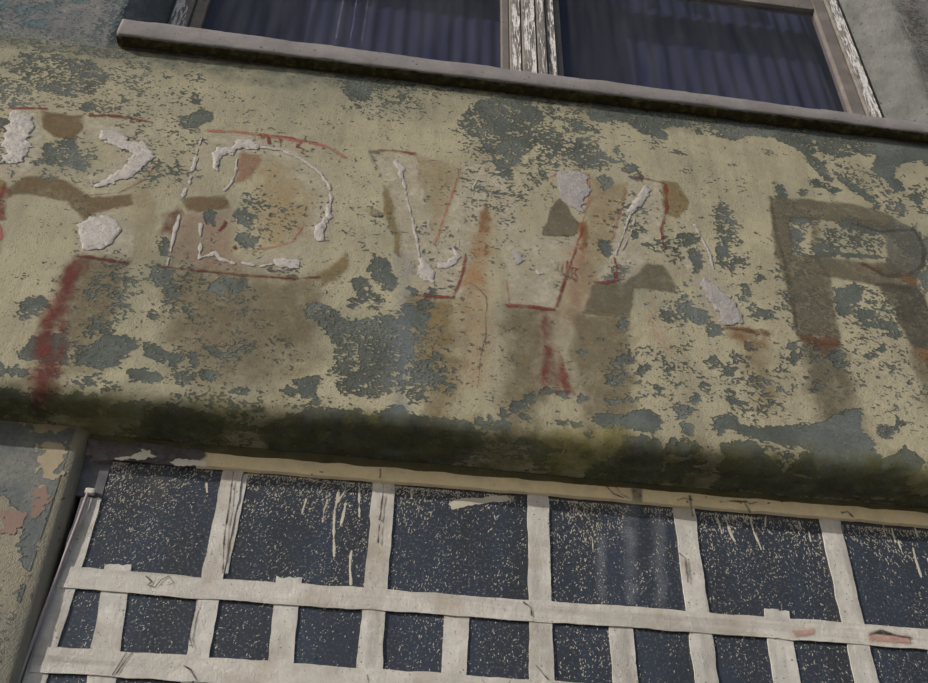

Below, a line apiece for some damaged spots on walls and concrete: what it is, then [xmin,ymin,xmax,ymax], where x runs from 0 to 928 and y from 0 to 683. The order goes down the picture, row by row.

peeling [0,0,283,262]
peeling [828,0,881,117]
peeling [0,75,928,571]